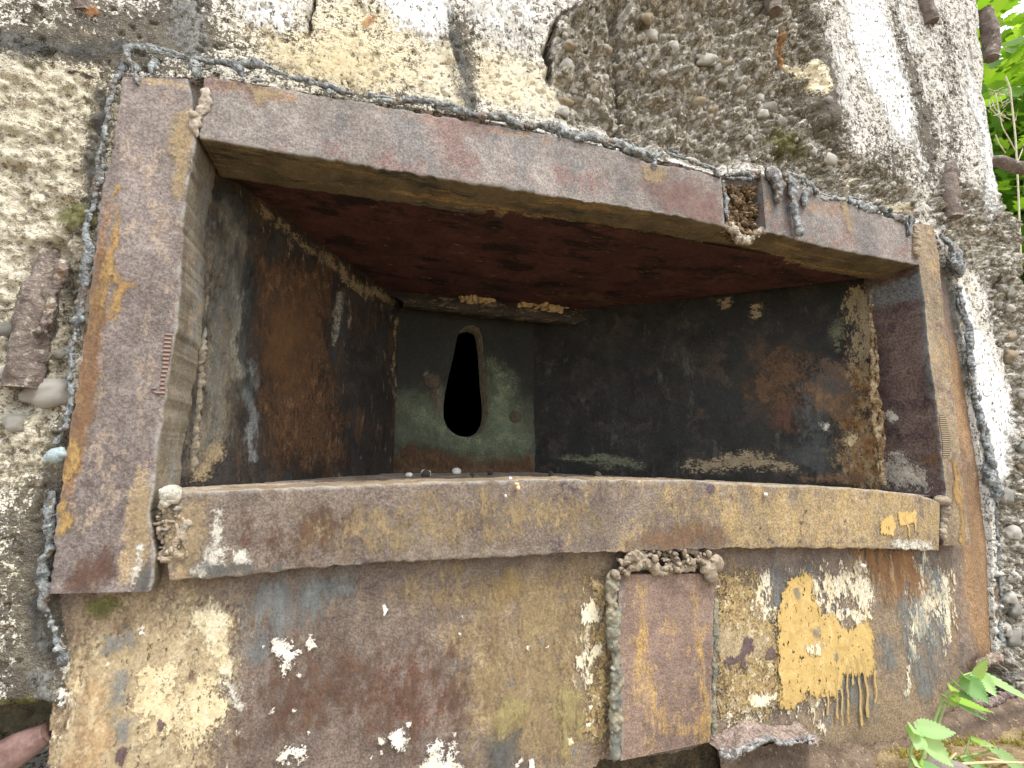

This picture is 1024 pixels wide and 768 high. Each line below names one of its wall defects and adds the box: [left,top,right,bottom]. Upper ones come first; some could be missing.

crack [542,1,598,86]
corrosion [642,164,766,246]
corrosion [56,210,135,535]
corrosion [247,250,346,474]
corrosion [743,344,882,490]
corrosion [265,485,603,563]
peeling [785,554,878,638]
corrosion [850,548,929,603]
peeling [262,633,318,678]
corrosion [579,571,612,753]
peeling [712,562,829,744]
peeling [805,627,839,660]